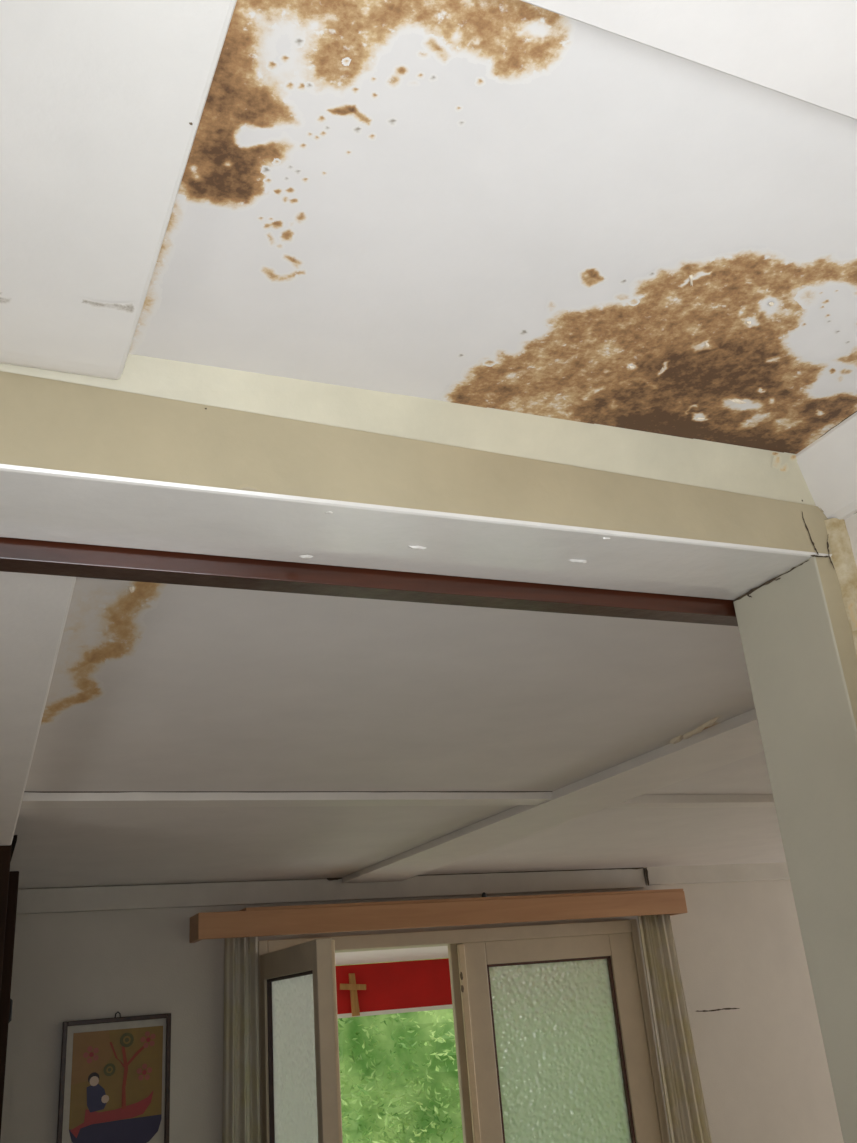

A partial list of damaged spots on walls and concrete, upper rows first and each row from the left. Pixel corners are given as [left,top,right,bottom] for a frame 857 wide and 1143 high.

water stain [128,0,578,355]
water stain [440,247,857,472]
crack [733,512,834,602]
water stain [40,579,167,727]
crack [696,1006,740,1014]